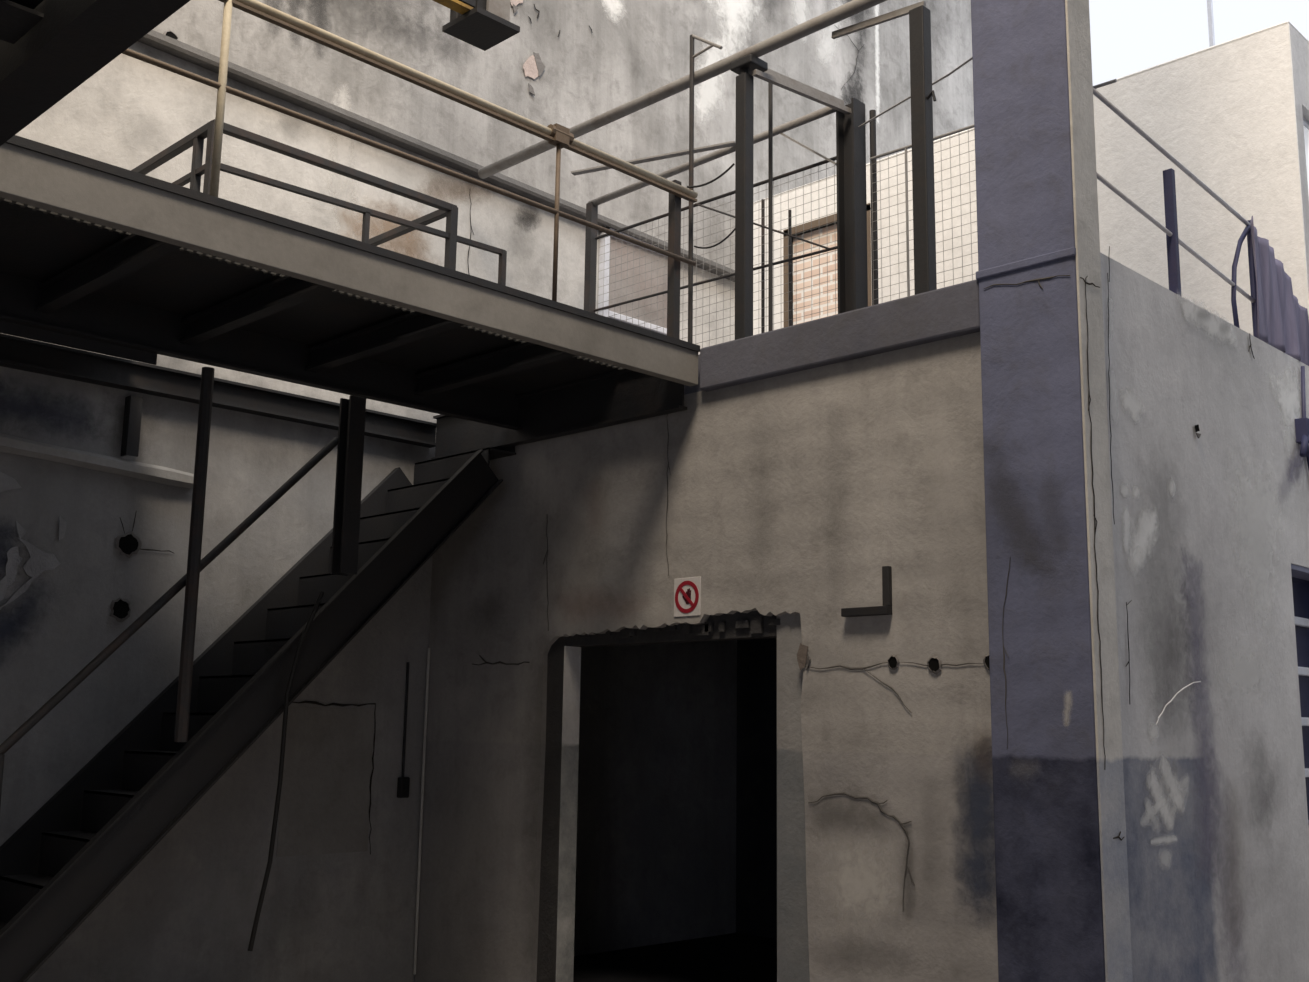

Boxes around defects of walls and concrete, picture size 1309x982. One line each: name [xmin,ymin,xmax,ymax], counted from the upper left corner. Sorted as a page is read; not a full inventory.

water stain [273,0,326,45]
spalling [523,52,545,96]
water stain [843,0,880,123]
peeling [0,515,67,610]
peeling [1121,486,1158,573]
crack [805,557,1011,749]
peeling [1143,757,1183,843]
crack [808,792,915,911]